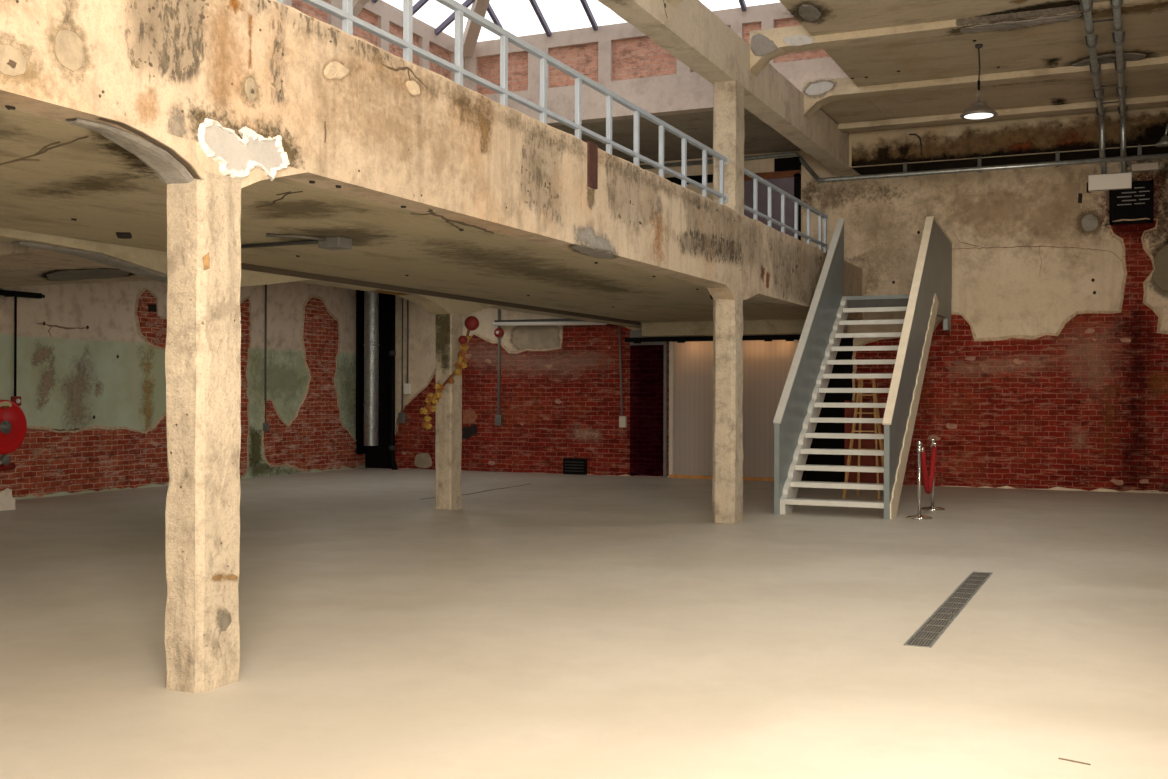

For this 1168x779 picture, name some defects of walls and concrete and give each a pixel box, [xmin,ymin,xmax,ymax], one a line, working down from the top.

crack [0,136,88,165]
crack [411,209,494,234]
damp [852,112,1168,259]
flaking render [0,347,169,497]
flaking render [134,287,167,350]
flaking render [239,295,365,478]
flaking render [395,368,436,470]
flaking render [461,324,669,476]
flaking render [852,337,901,403]
flaking render [903,218,1168,492]